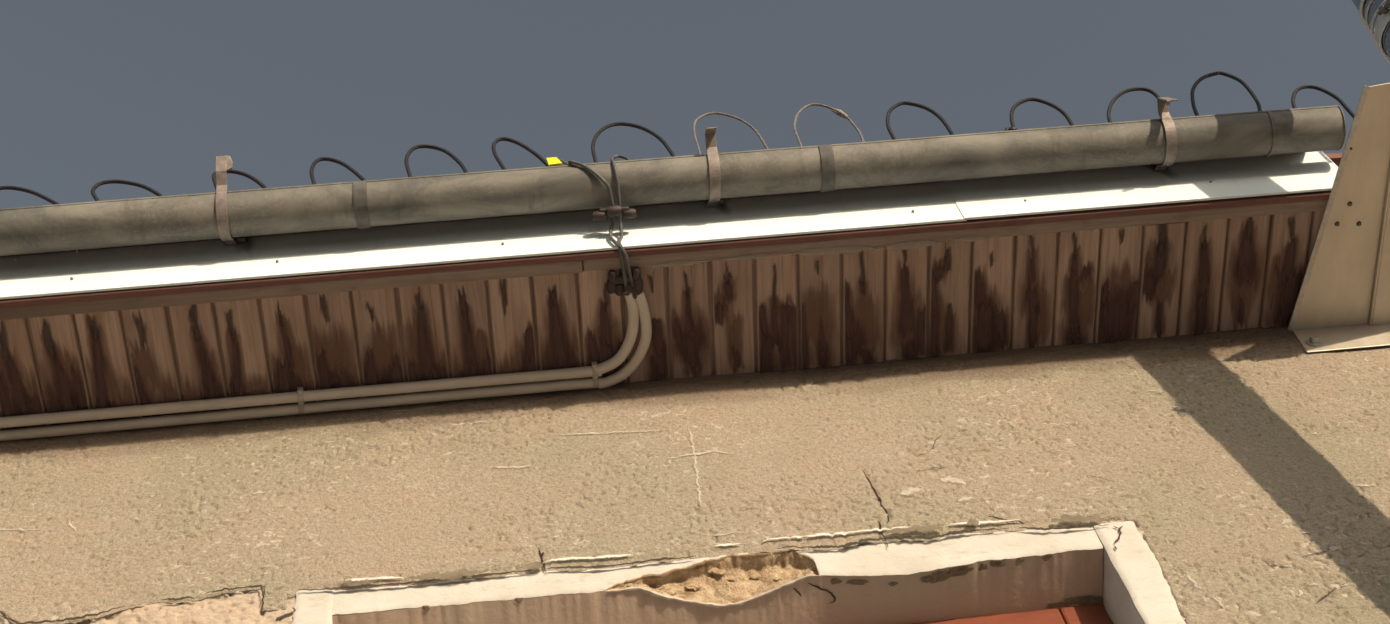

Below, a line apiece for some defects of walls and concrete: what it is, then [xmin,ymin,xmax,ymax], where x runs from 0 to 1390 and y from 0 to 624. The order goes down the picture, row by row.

leakage [0,227,1305,448]
crack [778,470,1124,549]
peeling [1051,514,1107,523]
peeling [343,569,488,586]
spalling [604,519,1024,608]
crack [793,583,836,604]